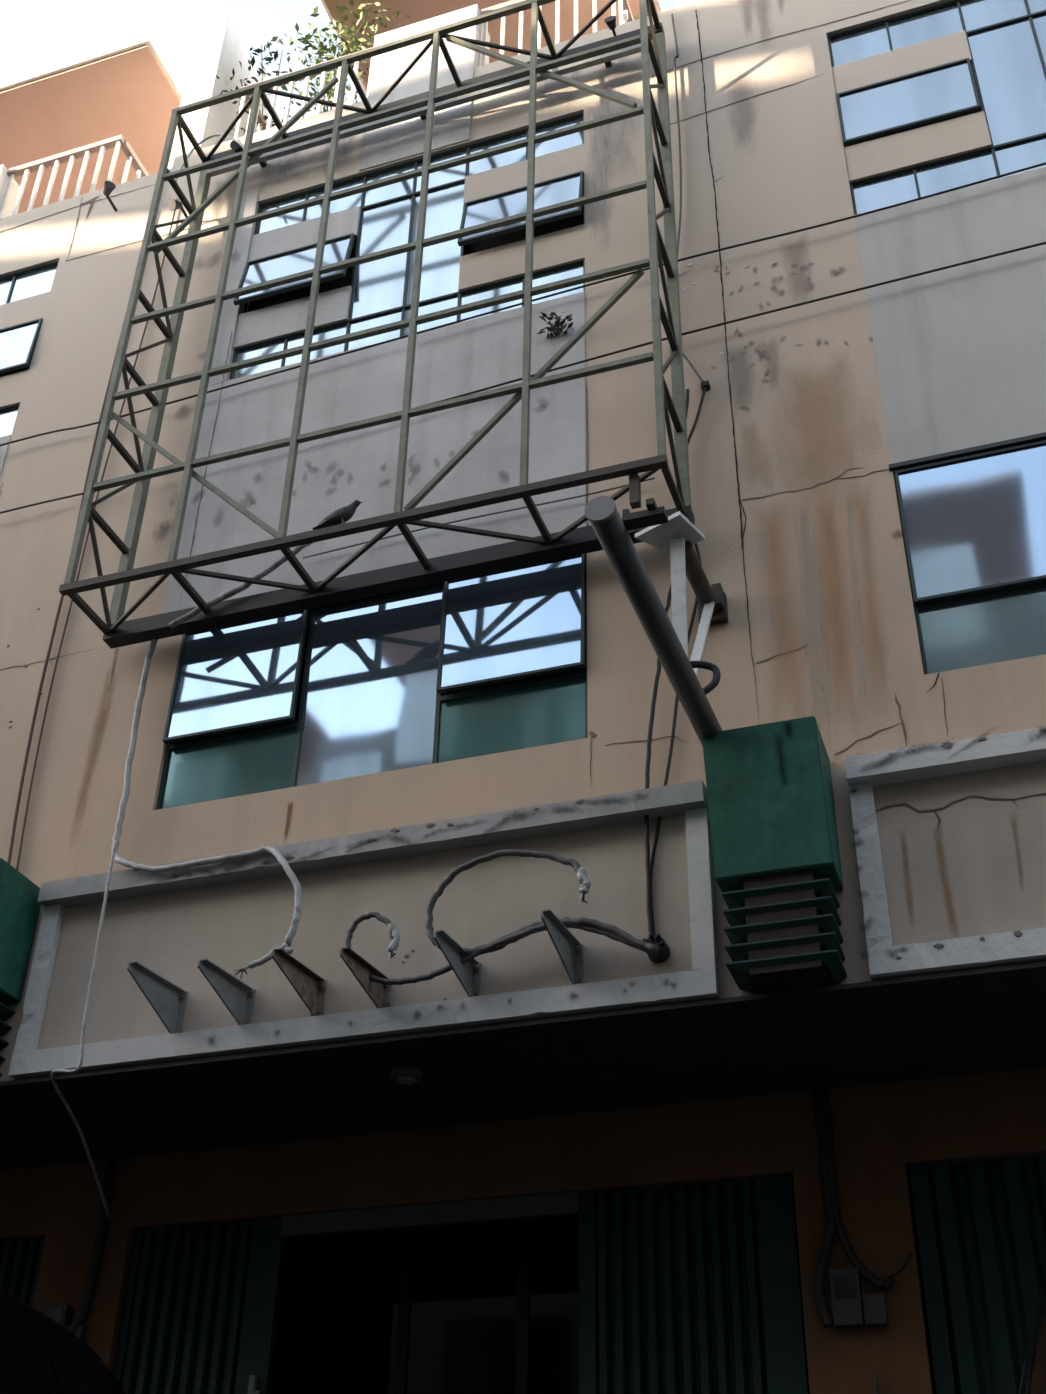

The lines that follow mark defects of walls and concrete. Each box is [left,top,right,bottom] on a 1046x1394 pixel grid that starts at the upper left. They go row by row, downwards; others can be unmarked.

crack [695,9,887,714]
crack [835,673,948,755]
crack [876,793,1046,831]